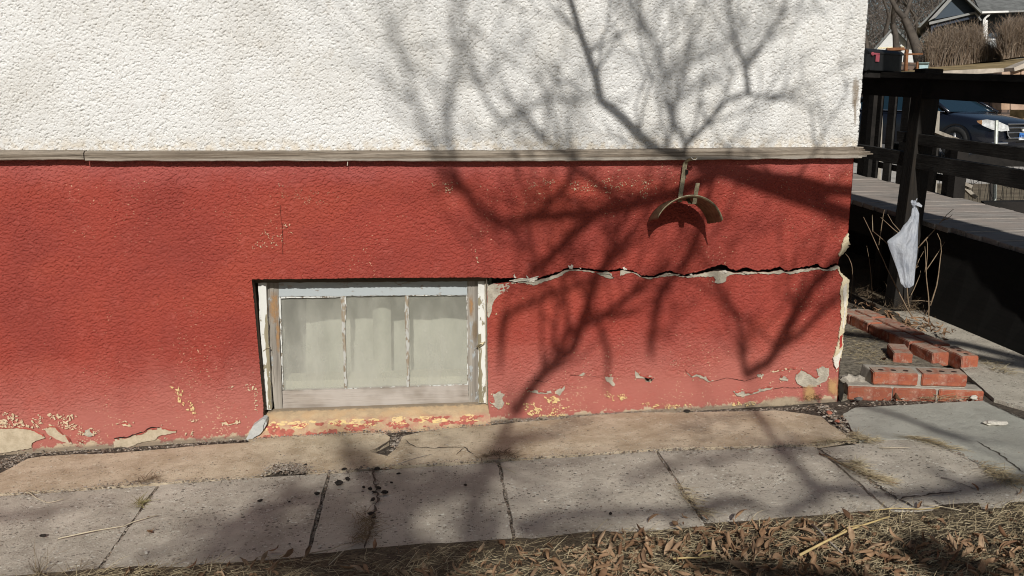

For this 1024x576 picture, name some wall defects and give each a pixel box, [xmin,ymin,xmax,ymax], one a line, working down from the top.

crack [508,265,839,285]
spalling [732,233,850,407]
peeling [635,370,657,386]
peeling [0,412,99,455]
peeling [114,386,201,447]
peeling [219,384,258,426]
peeling [263,390,510,438]
peeling [523,385,569,417]
crack [364,440,473,548]